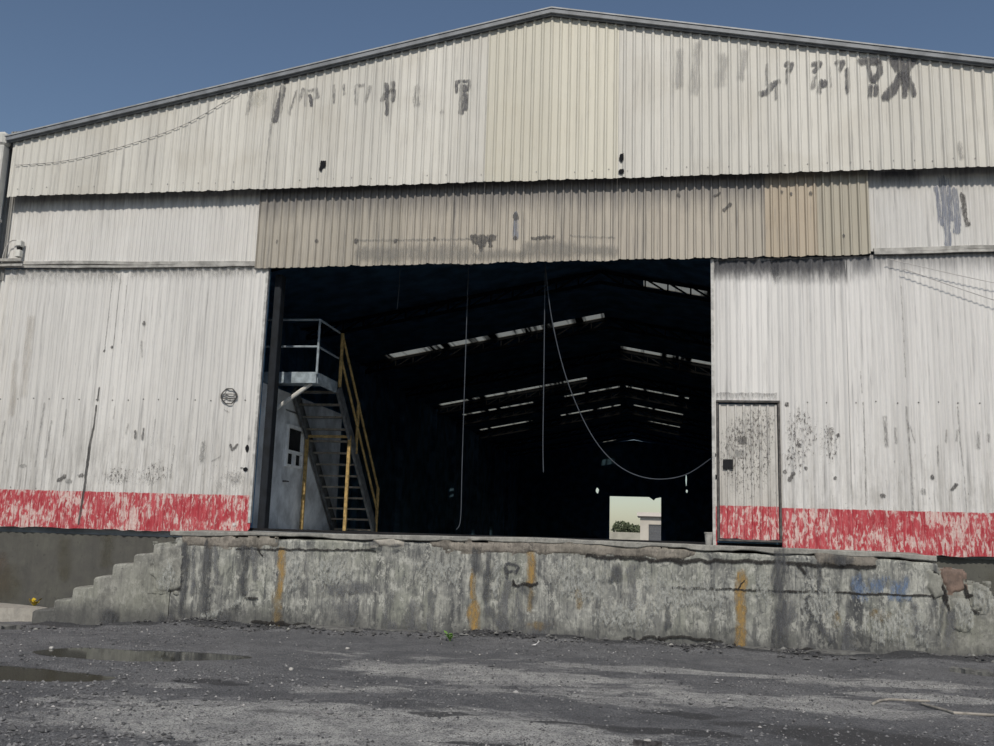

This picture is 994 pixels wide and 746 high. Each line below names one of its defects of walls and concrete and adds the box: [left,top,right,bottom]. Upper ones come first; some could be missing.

leakage [472,549,522,630]
leakage [609,566,636,607]
spalling [925,567,993,638]